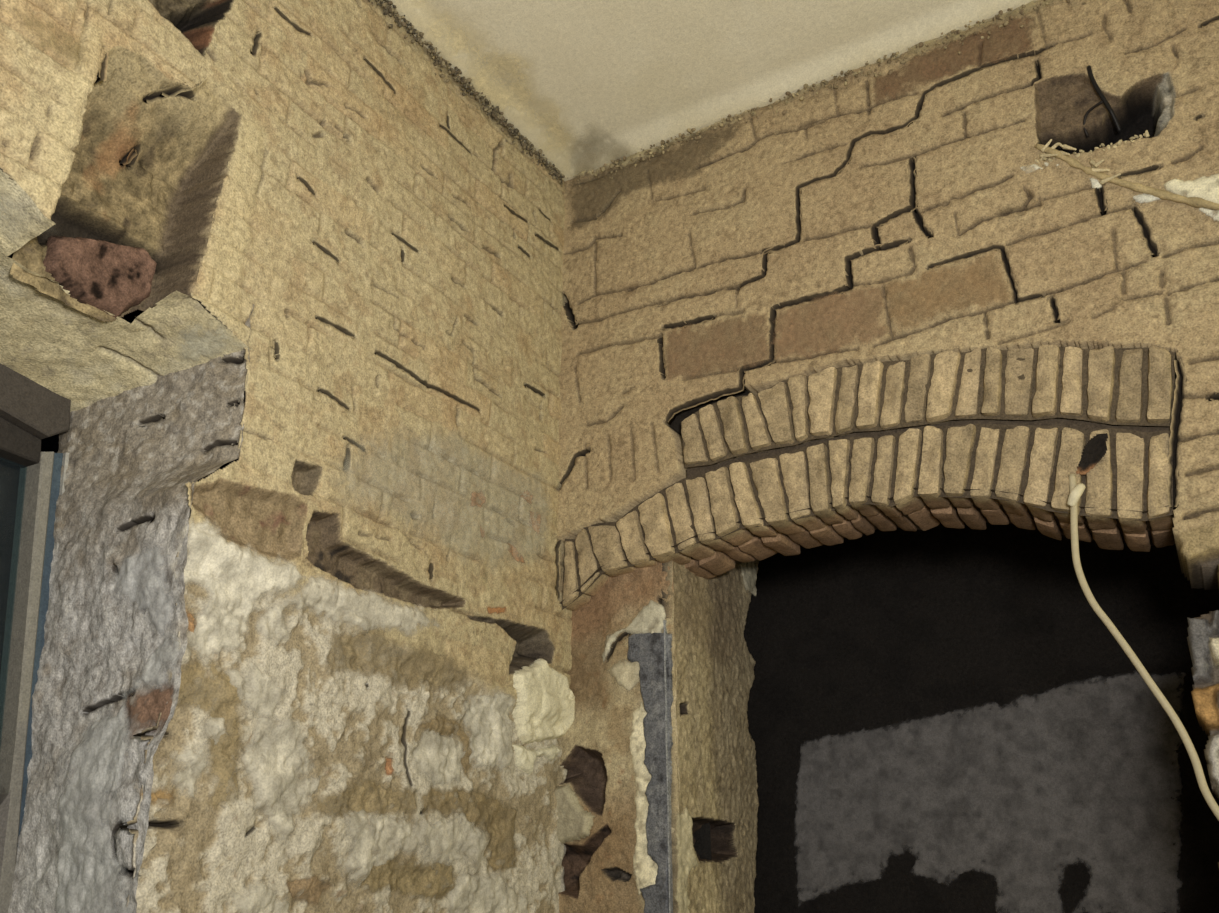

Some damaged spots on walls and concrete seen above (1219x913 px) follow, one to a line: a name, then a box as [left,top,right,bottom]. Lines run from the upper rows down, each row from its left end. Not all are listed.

spalling [145,0,238,59]
spalling [368,0,1052,187]
spalling [1021,70,1179,171]
water stain [574,127,734,227]
crack [657,43,1060,425]
crack [1094,164,1160,257]
crack [563,293,579,328]
flaking render [602,600,666,690]
flaking render [55,522,438,913]
flaking render [413,607,658,902]
flaking render [344,808,528,913]
spalling [676,808,740,913]